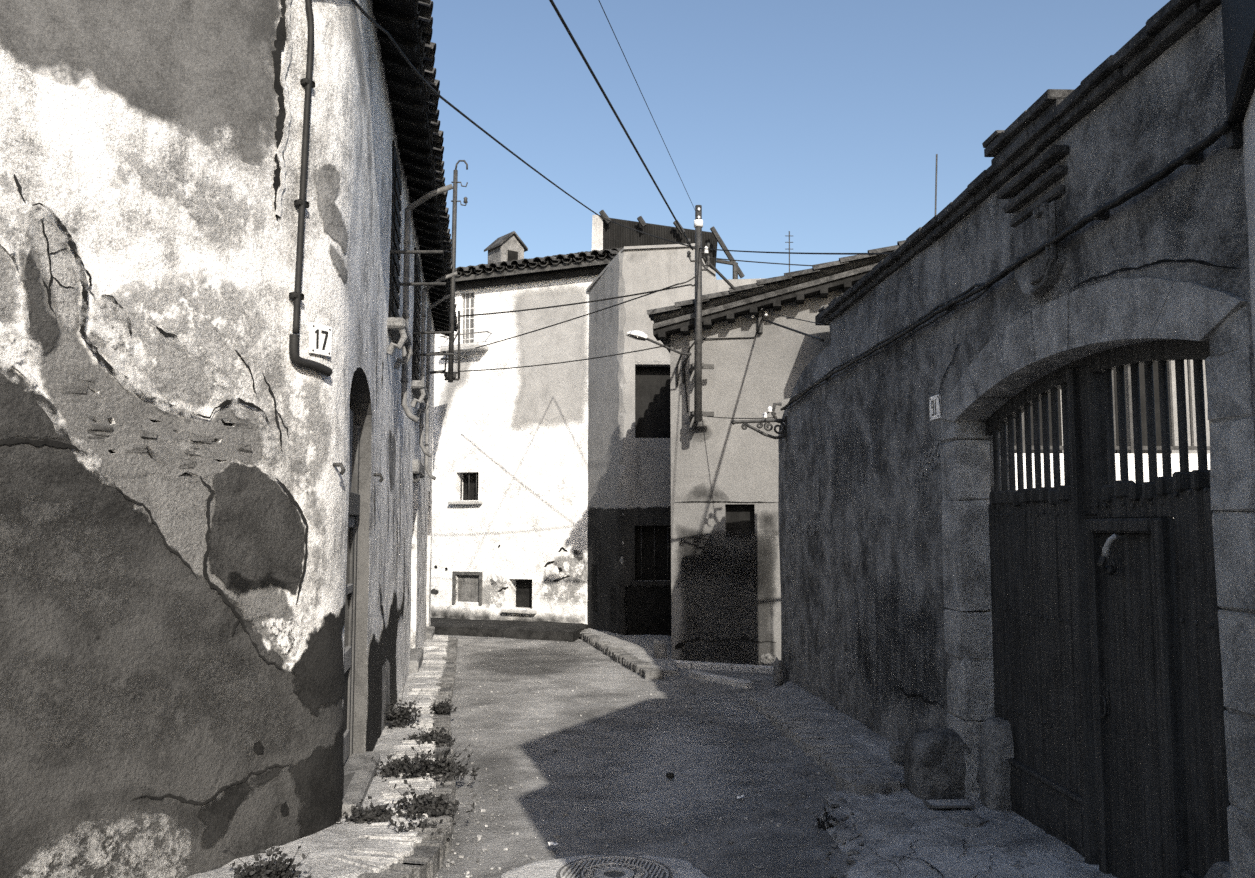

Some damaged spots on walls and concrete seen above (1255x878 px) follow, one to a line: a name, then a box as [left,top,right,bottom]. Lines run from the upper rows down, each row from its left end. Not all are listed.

crack [271,0,293,219]
flaking render [117,154,264,243]
flaking render [313,163,348,284]
crack [0,174,308,605]
flaking render [0,205,344,878]
flaking render [381,658,390,734]
crack [865,837,1090,878]